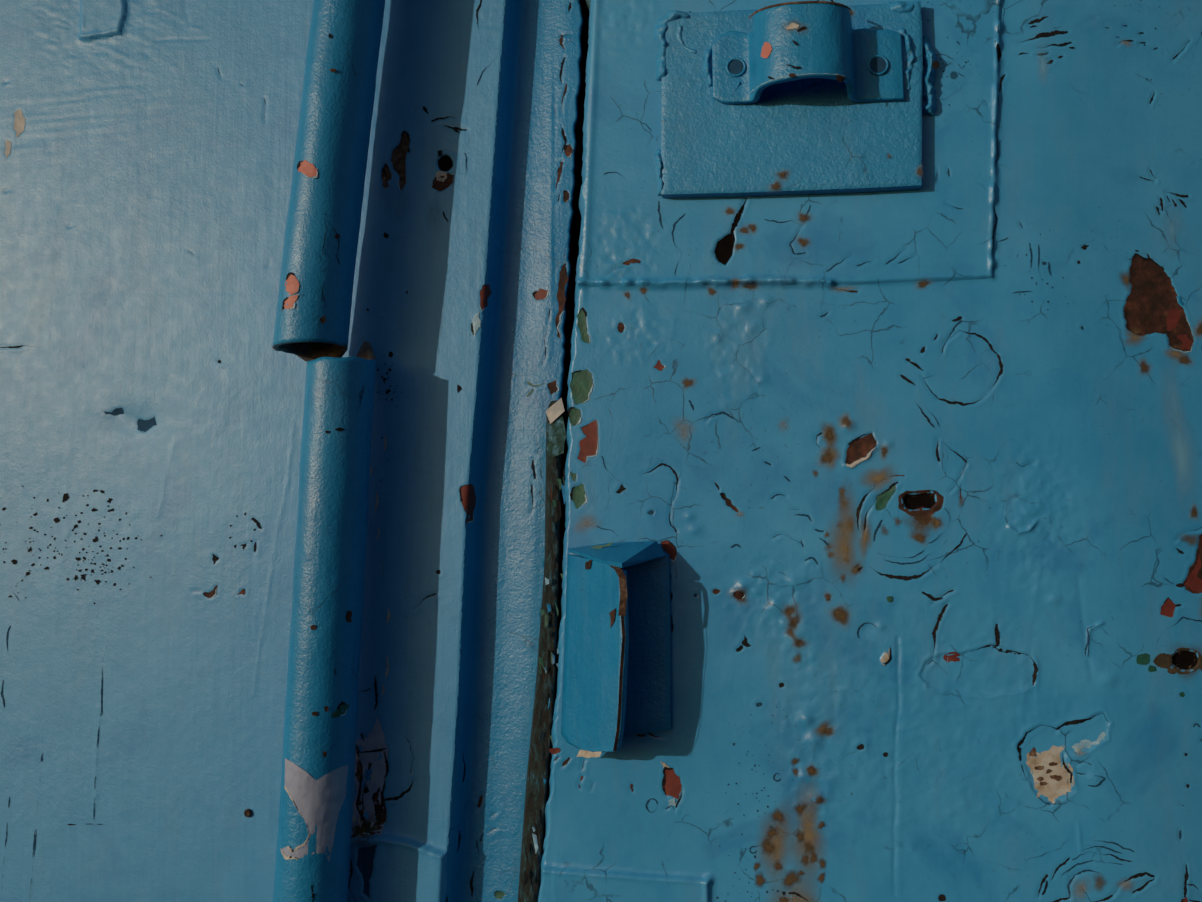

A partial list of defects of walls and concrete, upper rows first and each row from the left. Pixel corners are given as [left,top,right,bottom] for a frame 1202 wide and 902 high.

crack [927,2,1005,167]
peeling [381,131,410,191]
crack [556,128,573,202]
crack [764,205,911,271]
rust [1122,250,1202,364]
crack [900,316,1003,427]
peeling [527,369,598,509]
rust [1165,508,1202,594]
rust [785,608,803,661]
peeling [280,717,389,901]
rust [754,797,825,902]
peeling [1017,713,1109,805]